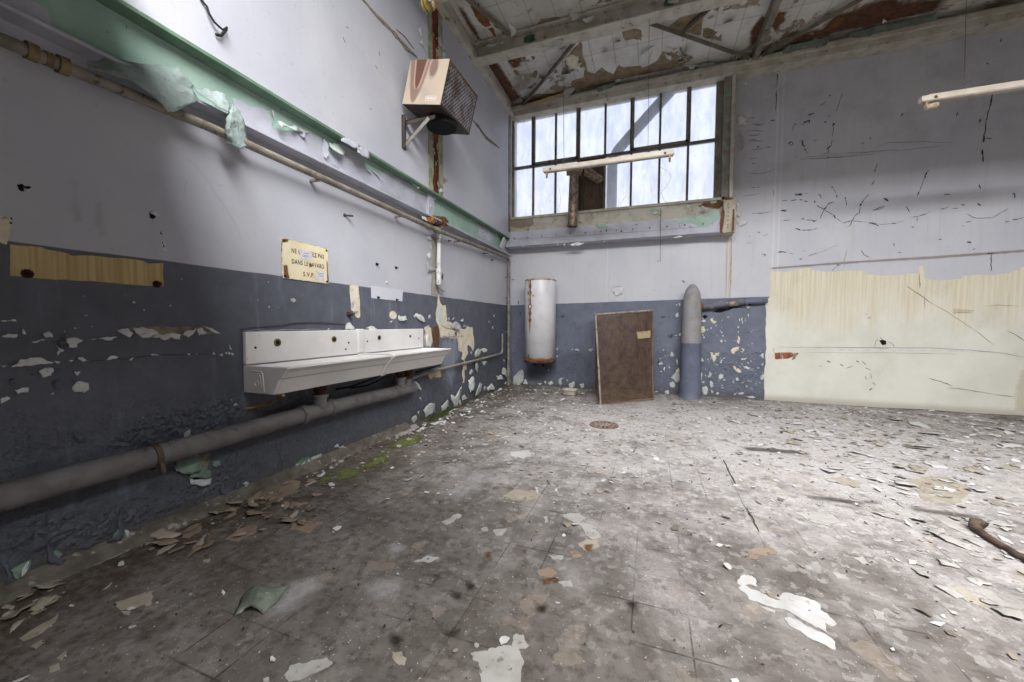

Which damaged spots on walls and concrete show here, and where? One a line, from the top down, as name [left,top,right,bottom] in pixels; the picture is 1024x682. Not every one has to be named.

peeling [473,2,609,47]
peeling [512,7,733,106]
peeling [842,14,939,38]
peeling [86,58,436,211]
crack [746,74,779,237]
crack [956,94,993,162]
peeling [542,201,720,246]
peeling [0,315,234,404]
spalling [345,234,584,437]
peeling [701,246,1024,416]